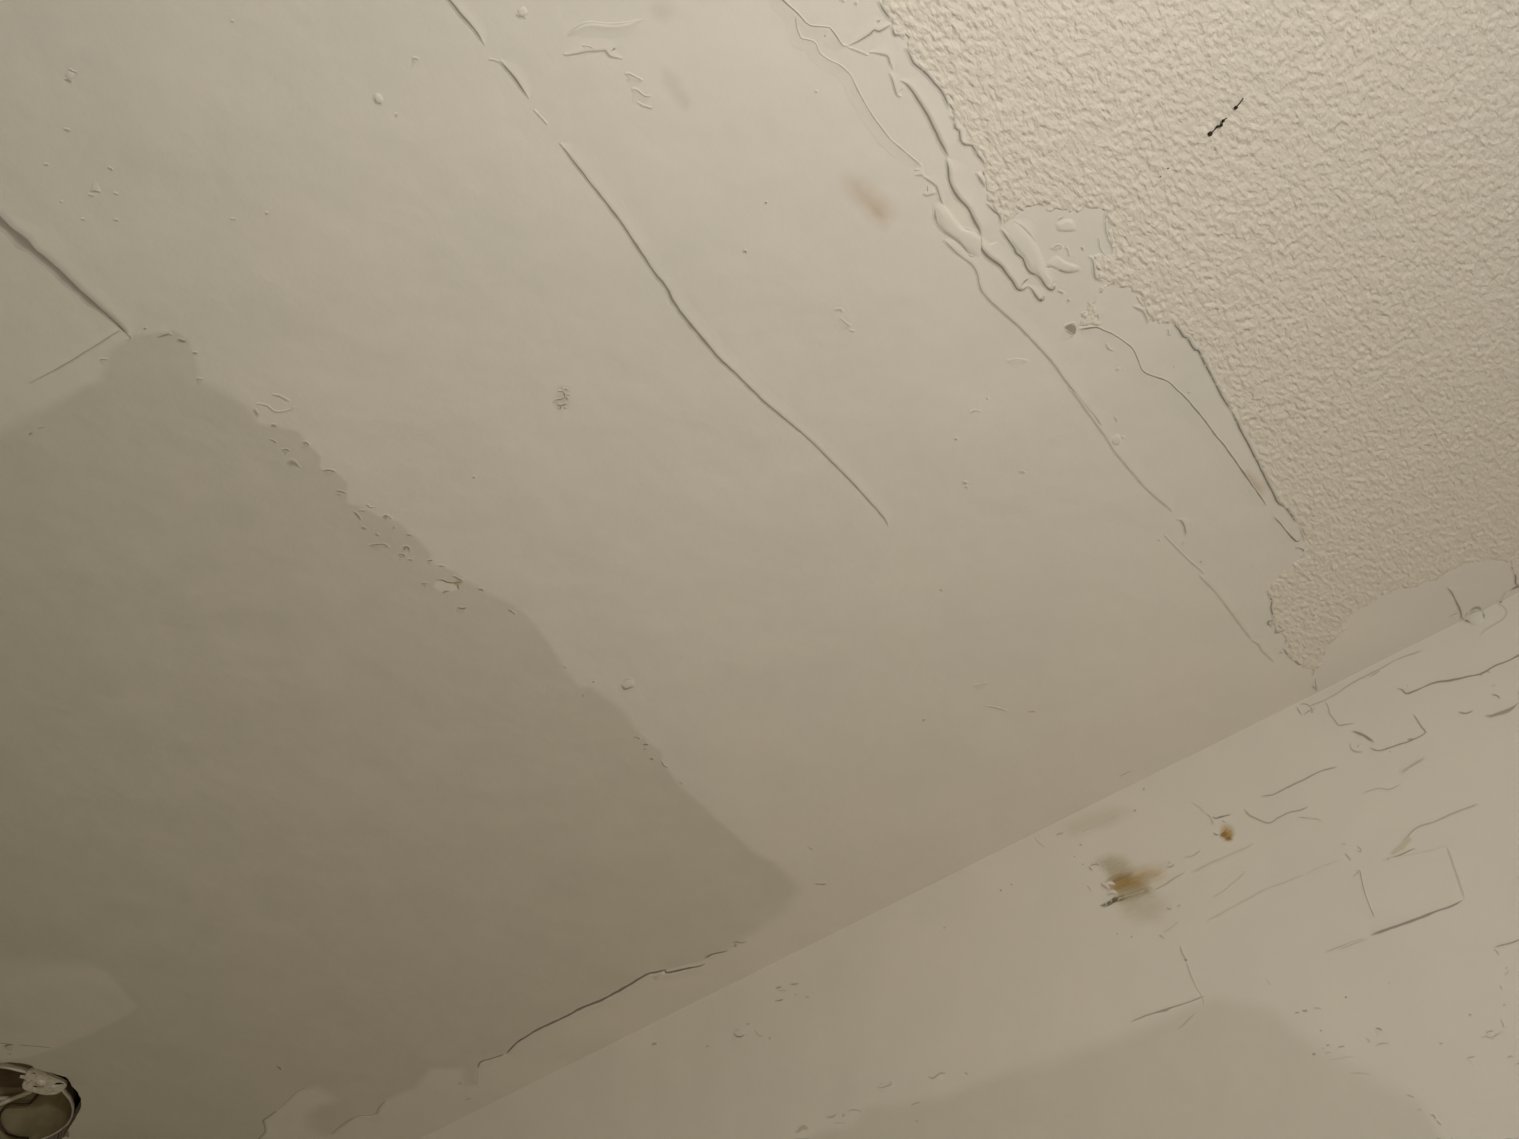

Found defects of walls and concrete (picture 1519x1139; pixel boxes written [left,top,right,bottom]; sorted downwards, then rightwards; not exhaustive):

peeling [877,0,1116,303]
crack [0,178,141,383]
crack [446,0,894,526]
spalling [1457,684,1519,721]
rust [1082,862,1144,908]
crack [457,940,747,1101]